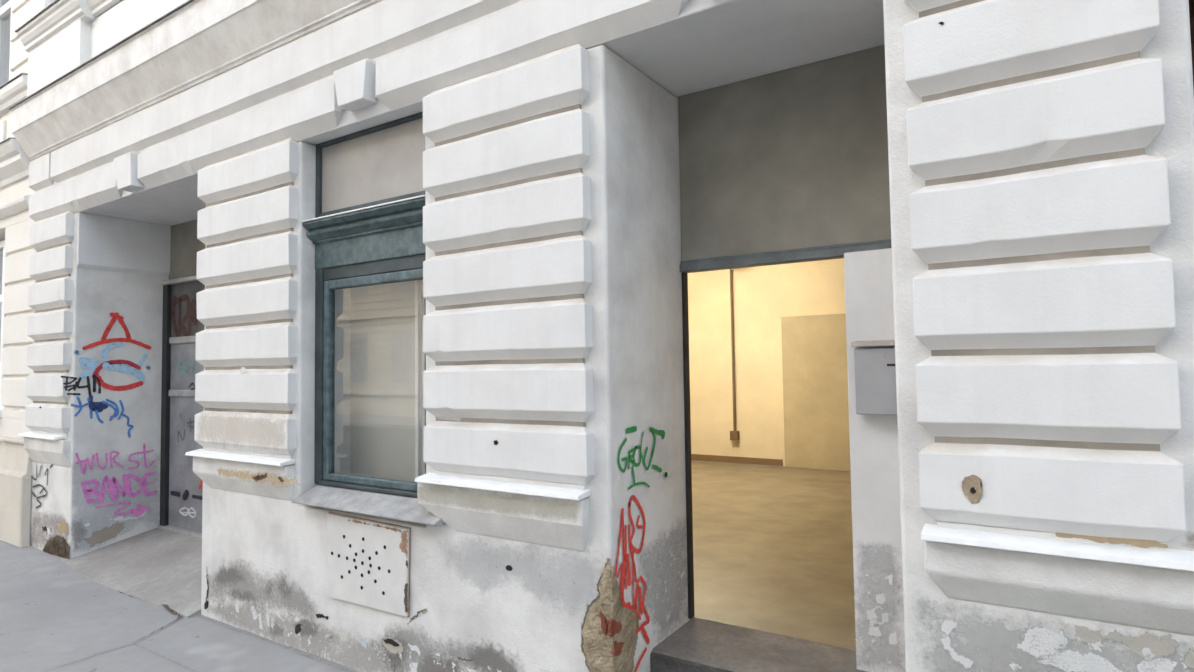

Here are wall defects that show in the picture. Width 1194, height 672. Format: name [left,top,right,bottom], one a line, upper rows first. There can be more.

spalling [962,475,983,503]
spalling [42,520,70,560]
peeling [83,511,149,547]
spalling [581,543,688,672]
leakage [386,631,517,672]
peeling [940,619,974,669]
peeling [1009,625,1194,672]